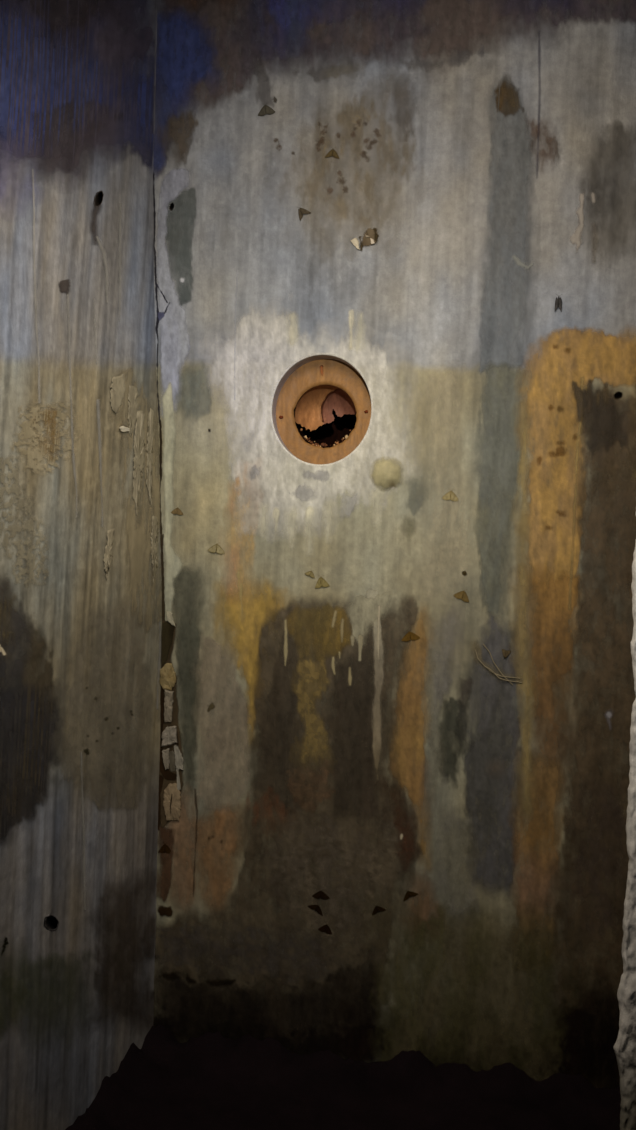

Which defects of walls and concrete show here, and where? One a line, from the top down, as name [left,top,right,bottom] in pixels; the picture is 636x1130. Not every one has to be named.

leakage [0,294,78,839]
peeling [104,369,184,830]
crack [153,172,168,621]
rust [221,464,283,733]
leakage [95,169,422,1051]
leakage [0,0,636,173]
leakage [308,104,408,226]
spalling [350,228,379,251]
rust [513,329,636,966]
leakage [551,377,636,1019]
leakage [570,124,631,254]